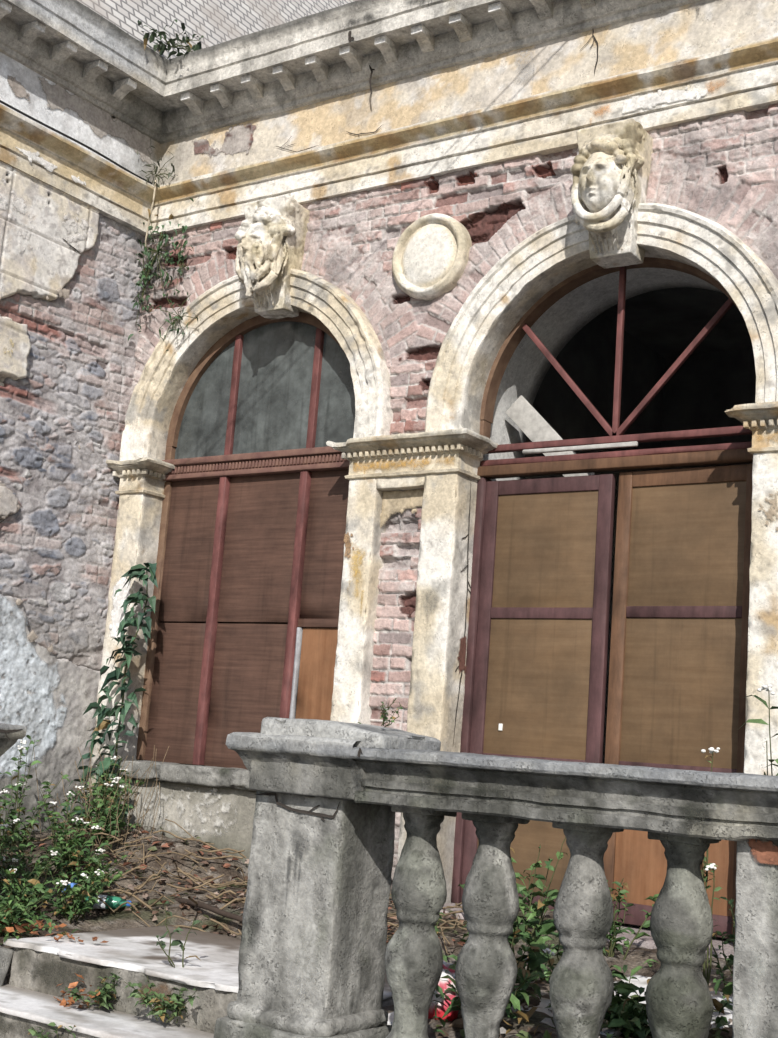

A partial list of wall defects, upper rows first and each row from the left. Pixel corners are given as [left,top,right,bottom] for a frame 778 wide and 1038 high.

crack [581,30,598,74]
peeling [8,76,30,101]
crack [368,65,376,94]
peeling [39,78,152,164]
flaking render [192,123,256,158]
peeling [16,147,57,172]
flaking render [0,213,187,776]
peeling [380,489,424,527]
spalling [400,593,416,618]
spalling [748,839,778,865]